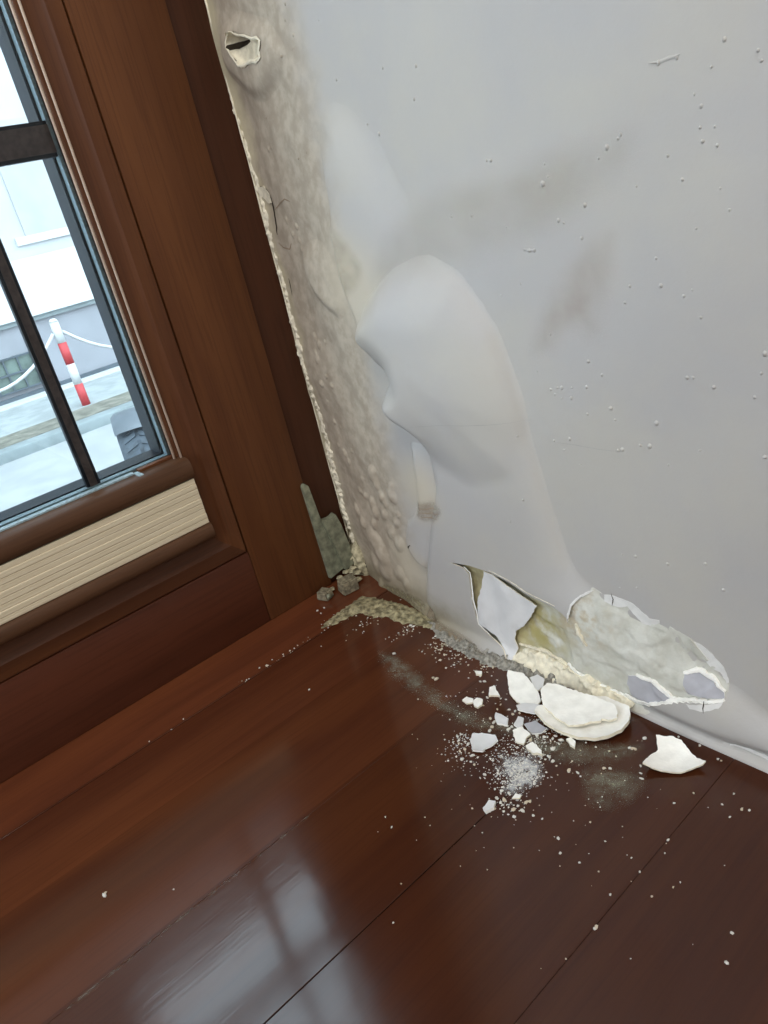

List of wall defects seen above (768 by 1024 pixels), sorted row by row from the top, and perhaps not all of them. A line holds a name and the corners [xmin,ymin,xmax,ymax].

spalling [204,0,261,68]
spalling [224,74,729,735]